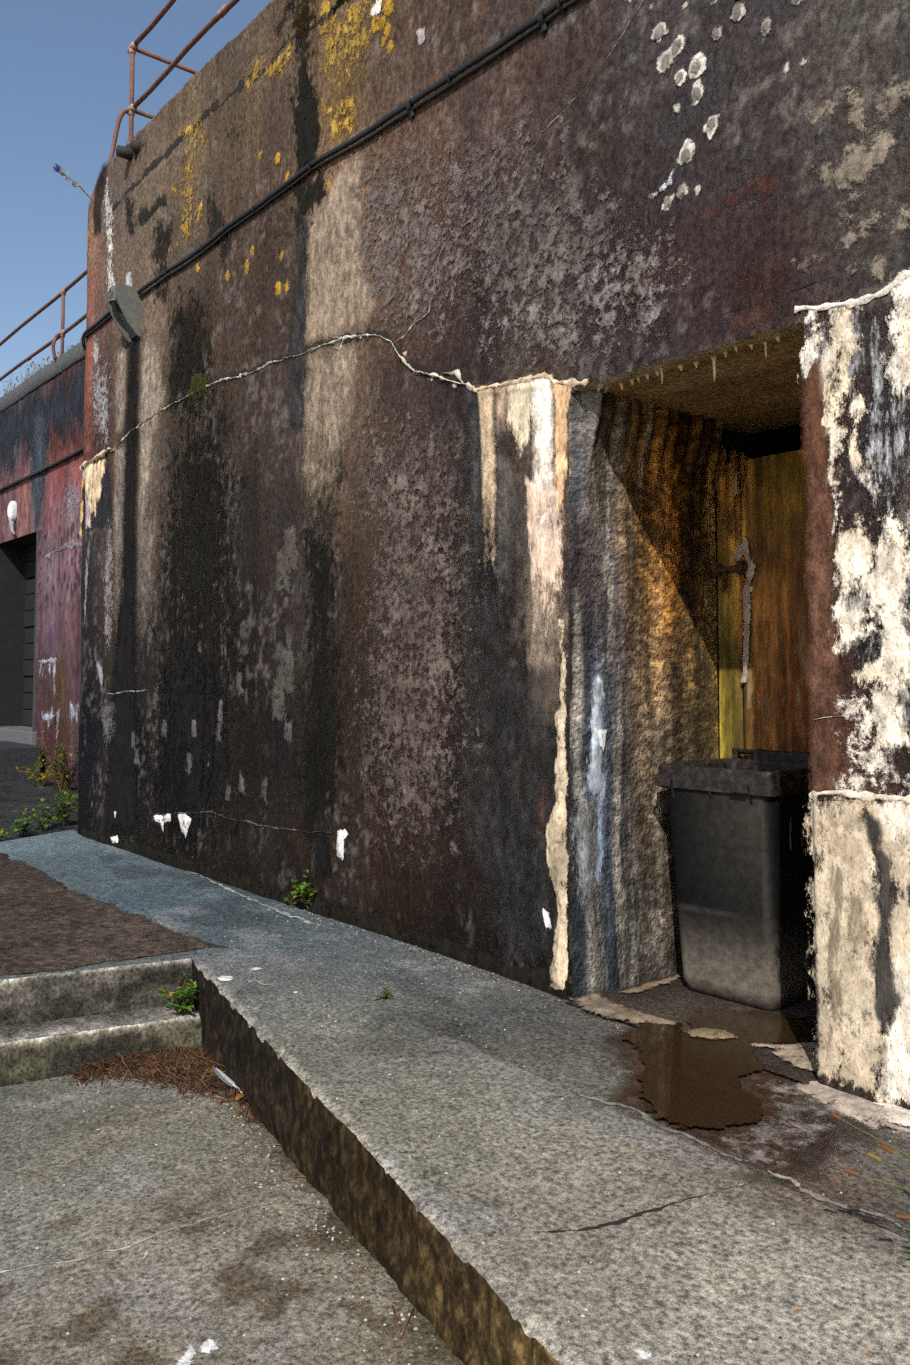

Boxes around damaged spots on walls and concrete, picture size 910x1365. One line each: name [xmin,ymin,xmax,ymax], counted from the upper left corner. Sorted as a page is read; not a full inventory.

damp [0,185,321,926]
damp [275,0,375,876]
crack [108,0,644,455]
damp [458,270,910,1176]
crack [536,1094,906,1238]